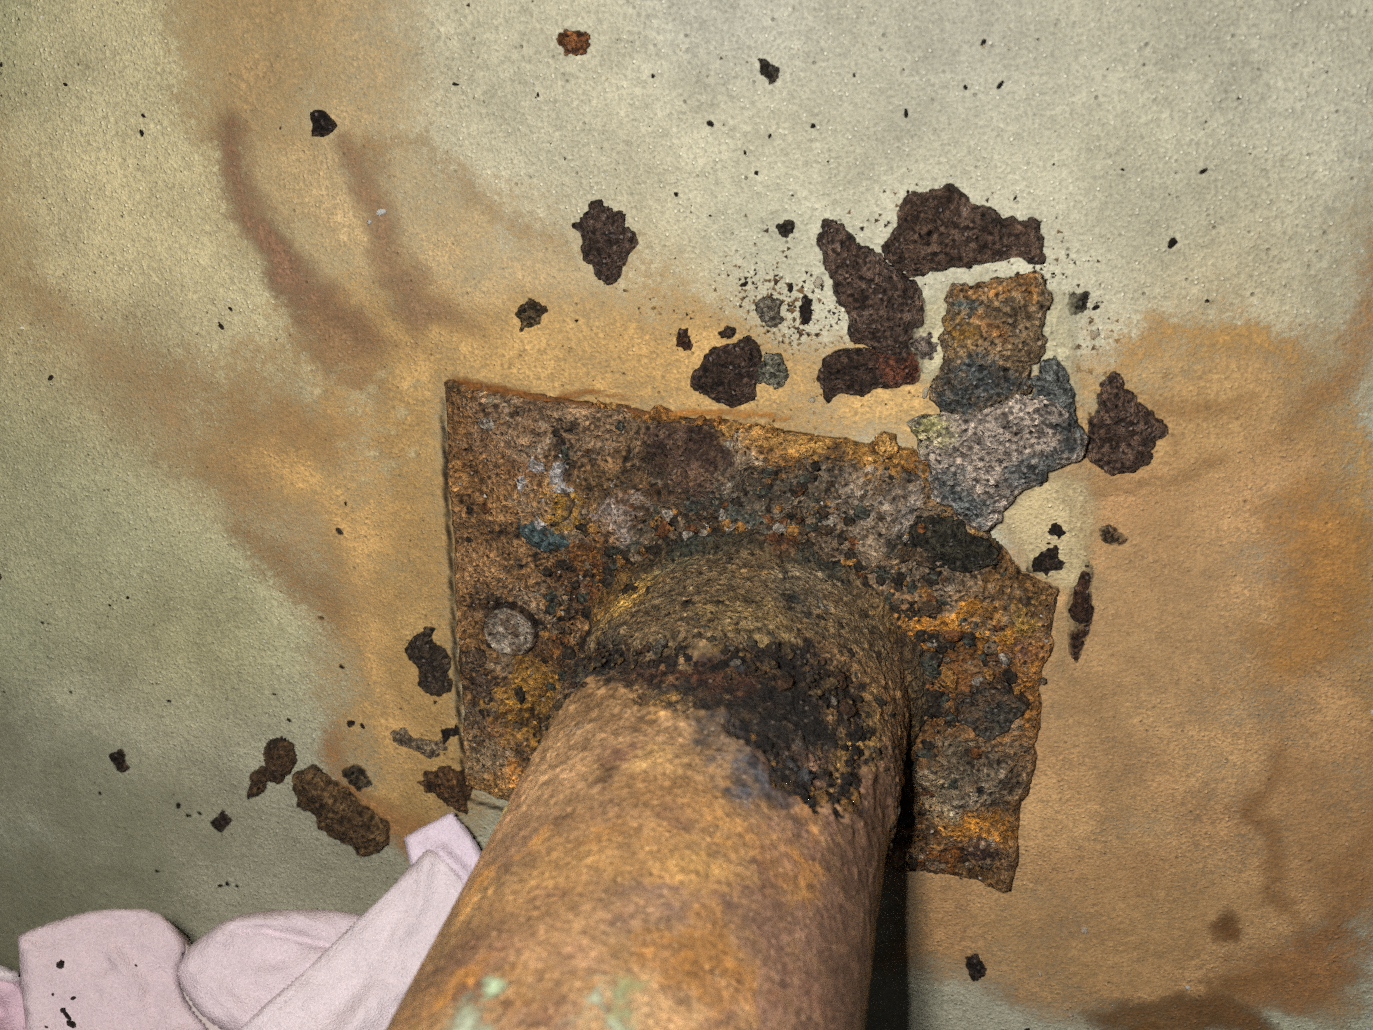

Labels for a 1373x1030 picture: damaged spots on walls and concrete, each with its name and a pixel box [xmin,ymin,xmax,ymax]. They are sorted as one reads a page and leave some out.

rust [199,0,1109,851]
peeling [906,295,1095,587]
rust [879,325,1373,1030]